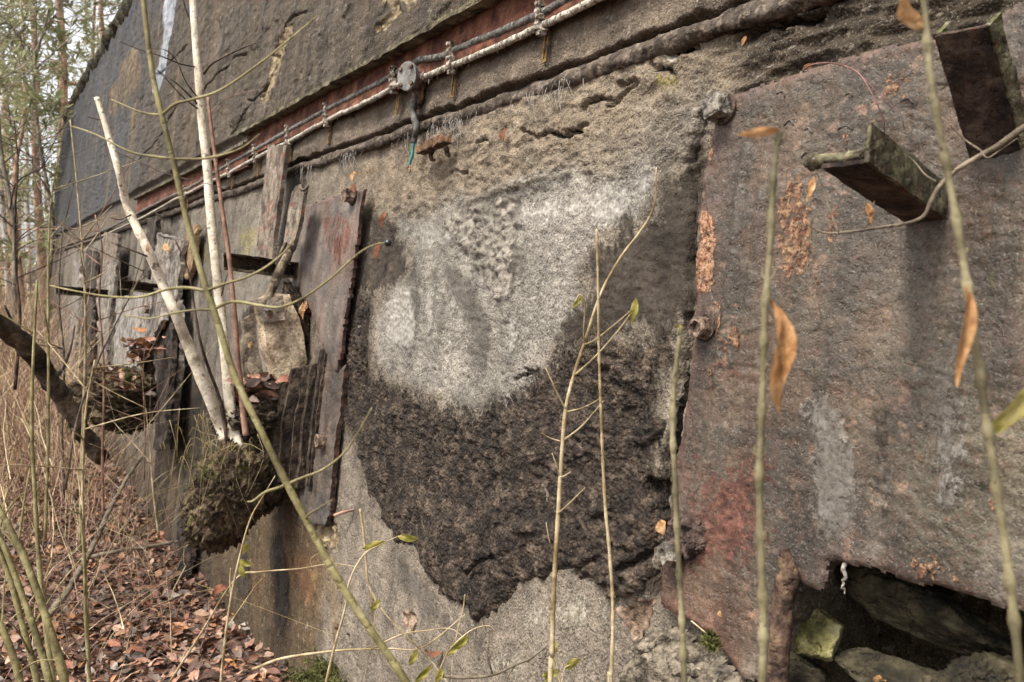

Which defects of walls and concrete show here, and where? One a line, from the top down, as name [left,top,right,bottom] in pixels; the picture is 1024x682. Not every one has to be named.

damp [359,210,490,366]
efflorescence [508,292,549,356]
damp [513,139,710,350]
rust [665,445,776,579]
damp [462,629,534,680]
efflorescence [526,590,591,632]